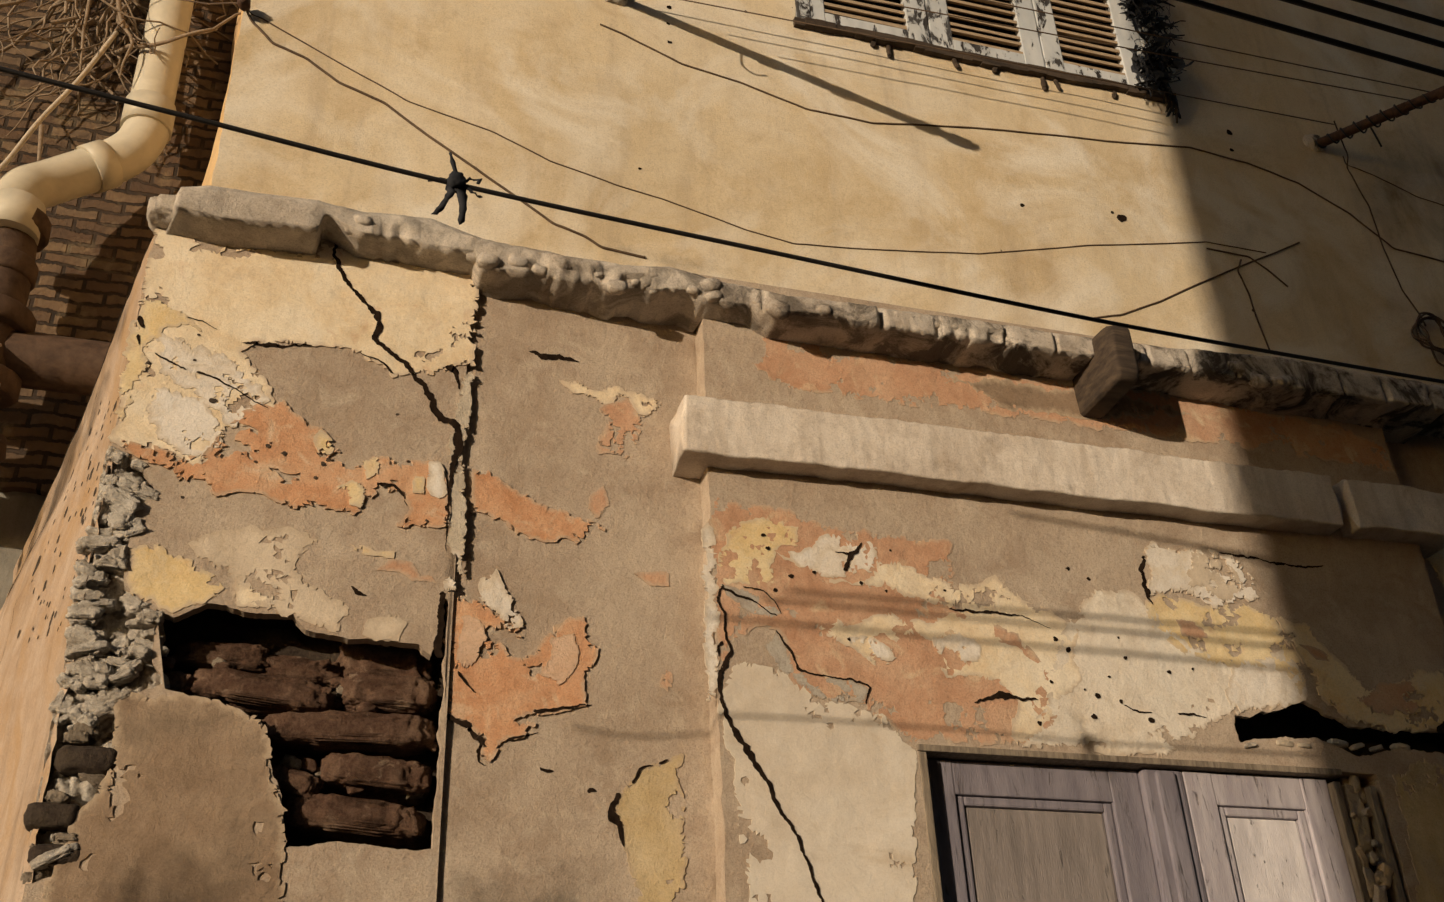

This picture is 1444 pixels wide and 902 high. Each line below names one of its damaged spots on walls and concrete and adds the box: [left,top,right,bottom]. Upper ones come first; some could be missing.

spalling [354,214,373,226]
crack [332,243,463,549]
flaking render [559,380,661,459]
peeling [17,228,610,884]
crack [351,586,367,596]
crack [717,584,871,902]
flaking render [700,497,1444,757]